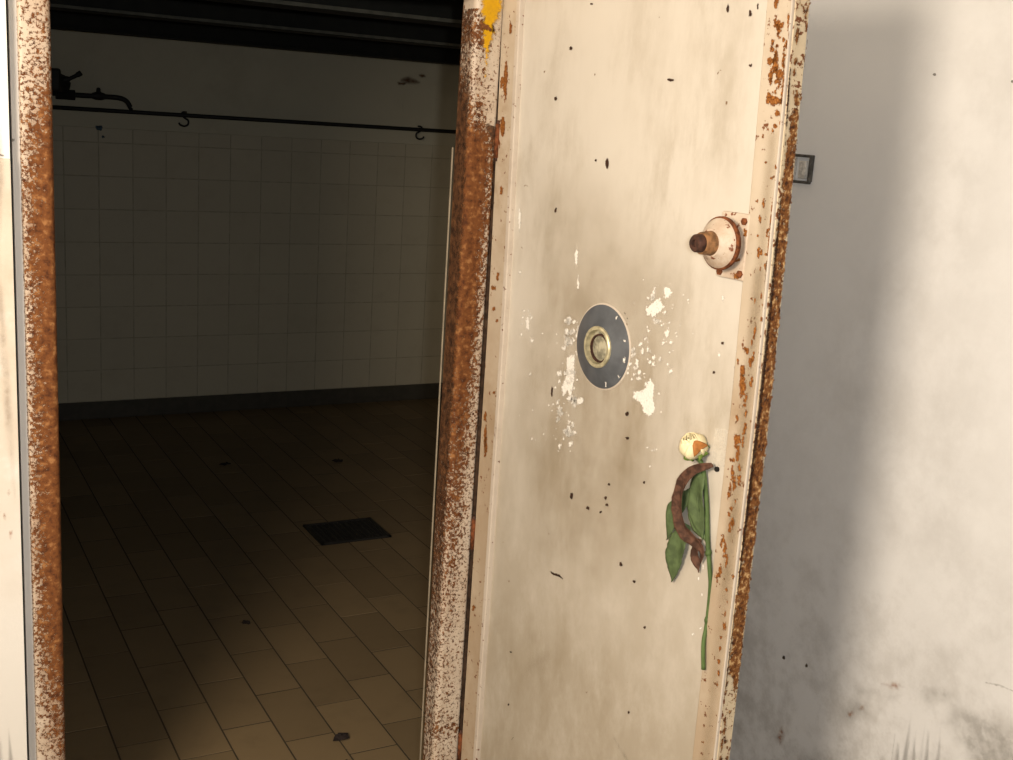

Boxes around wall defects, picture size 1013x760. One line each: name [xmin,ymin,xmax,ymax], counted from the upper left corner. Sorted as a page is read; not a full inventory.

corrosion [16,0,66,760]
corrosion [423,8,508,760]
peeling [520,309,583,452]
peeling [618,285,689,416]
corrosion [712,0,811,760]